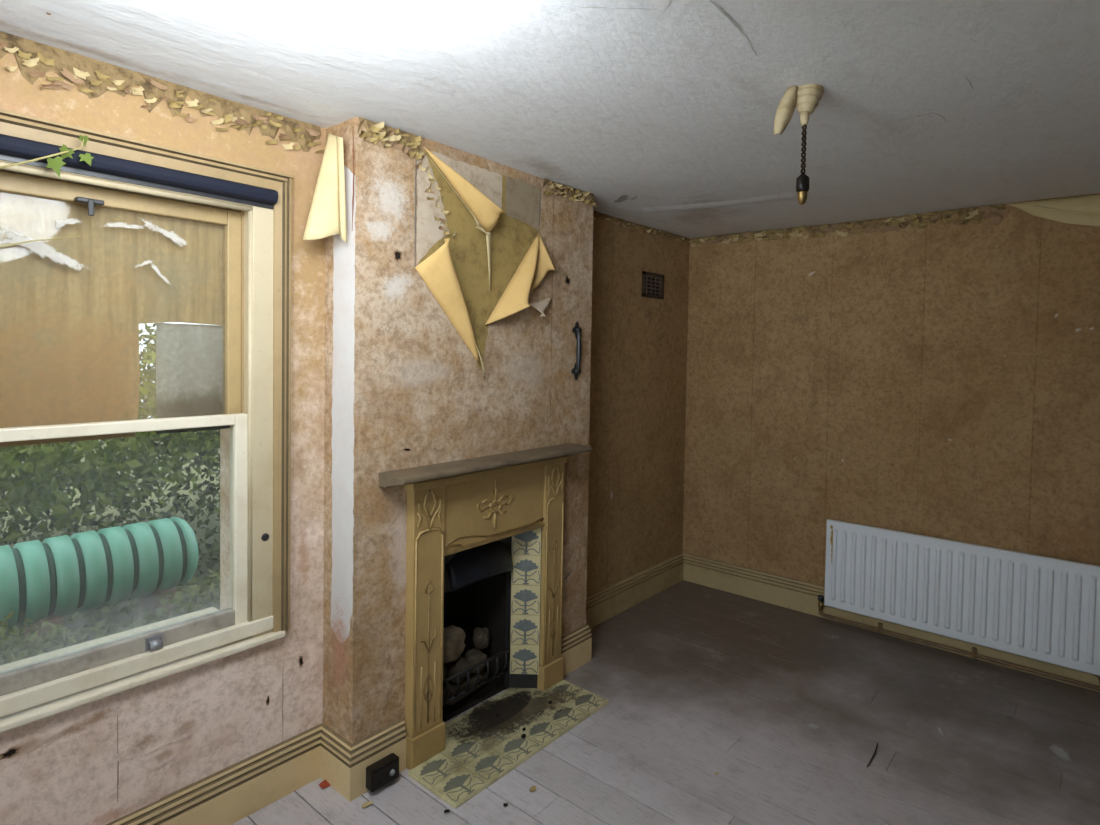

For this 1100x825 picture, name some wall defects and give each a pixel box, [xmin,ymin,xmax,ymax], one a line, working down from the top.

crack [709,0,757,56]
peeling [0,31,324,154]
flaking render [358,117,539,371]